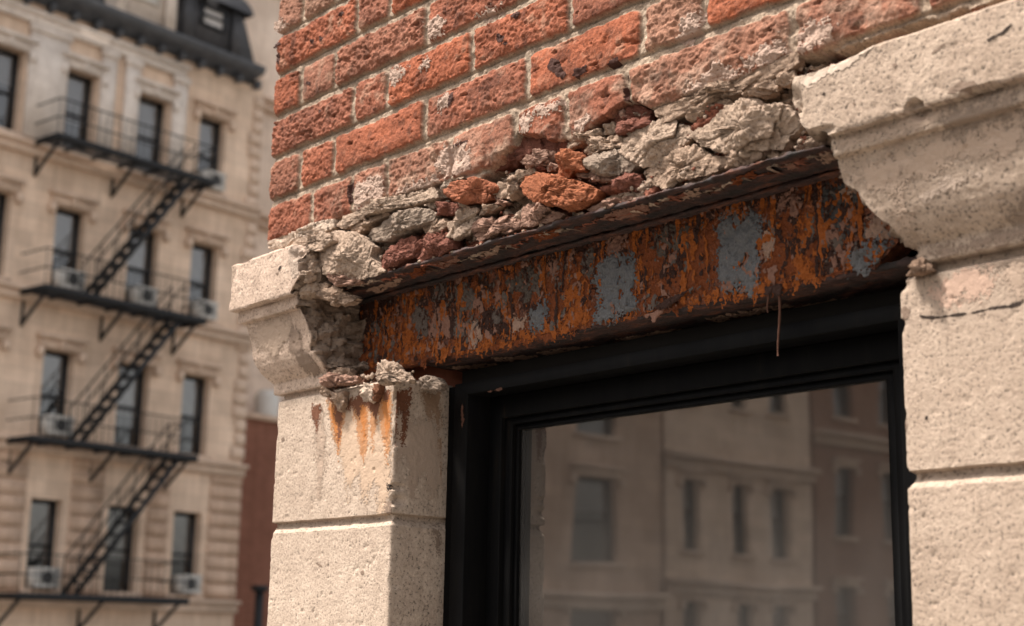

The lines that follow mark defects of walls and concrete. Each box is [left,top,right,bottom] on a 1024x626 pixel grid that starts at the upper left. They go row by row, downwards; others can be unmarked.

spalling [611,104,658,137]
spalling [276,246,304,278]
spalling [381,136,646,271]
rust [358,178,887,375]
crack [919,299,1024,319]
rust [311,385,444,519]